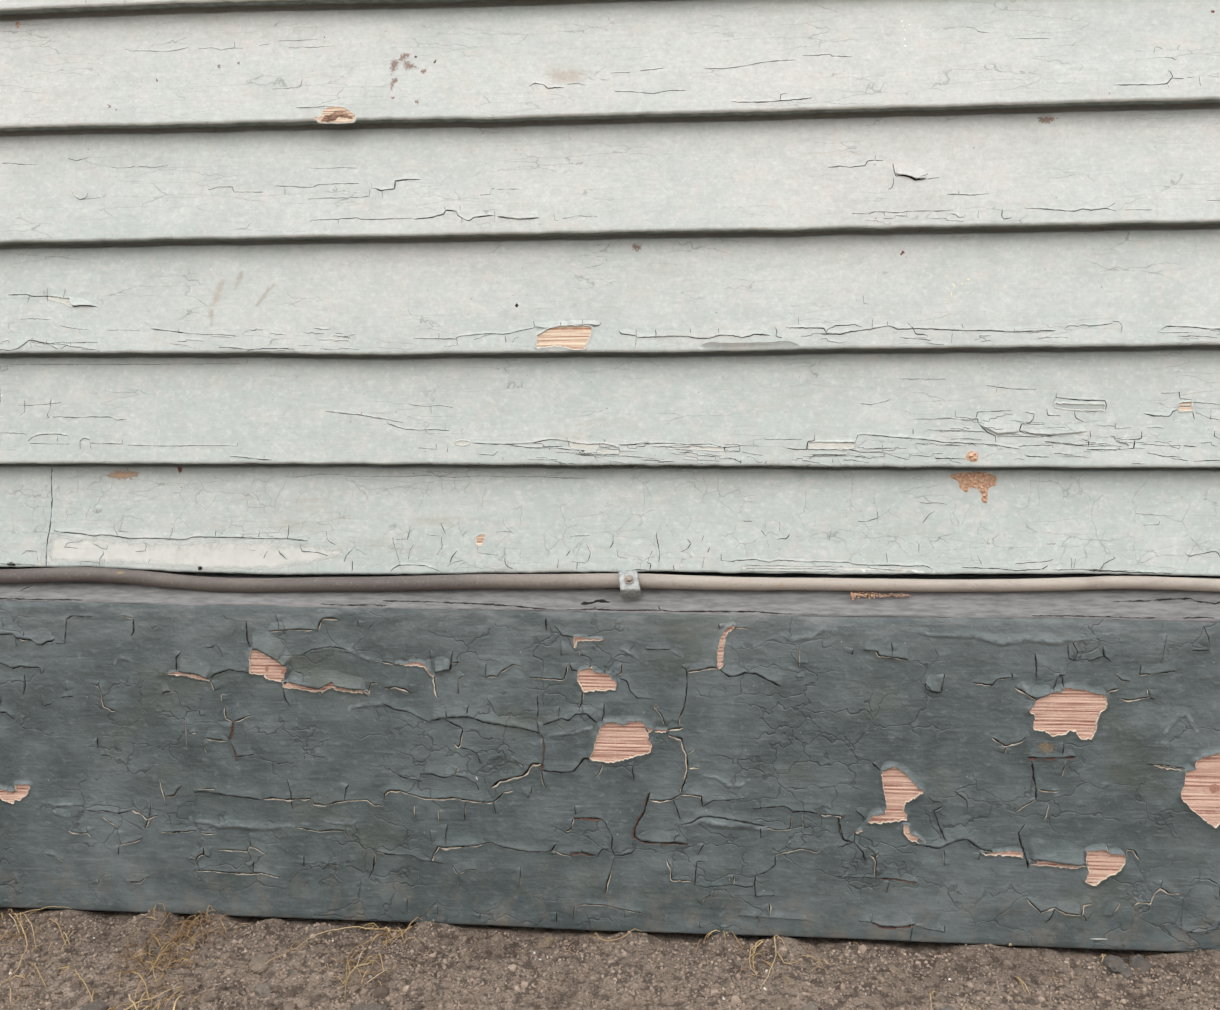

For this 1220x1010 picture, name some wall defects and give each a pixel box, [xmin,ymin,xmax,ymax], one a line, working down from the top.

crack [209,166,598,224]
crack [828,156,1151,225]
crack [0,317,359,366]
peeling [414,319,602,351]
crack [619,296,1124,349]
crack [269,523,821,636]
peeling [158,621,460,706]
peeling [542,617,783,806]
peeling [991,666,1118,754]
crack [68,656,948,941]
peeling [834,758,1144,890]
peeling [1147,746,1220,833]